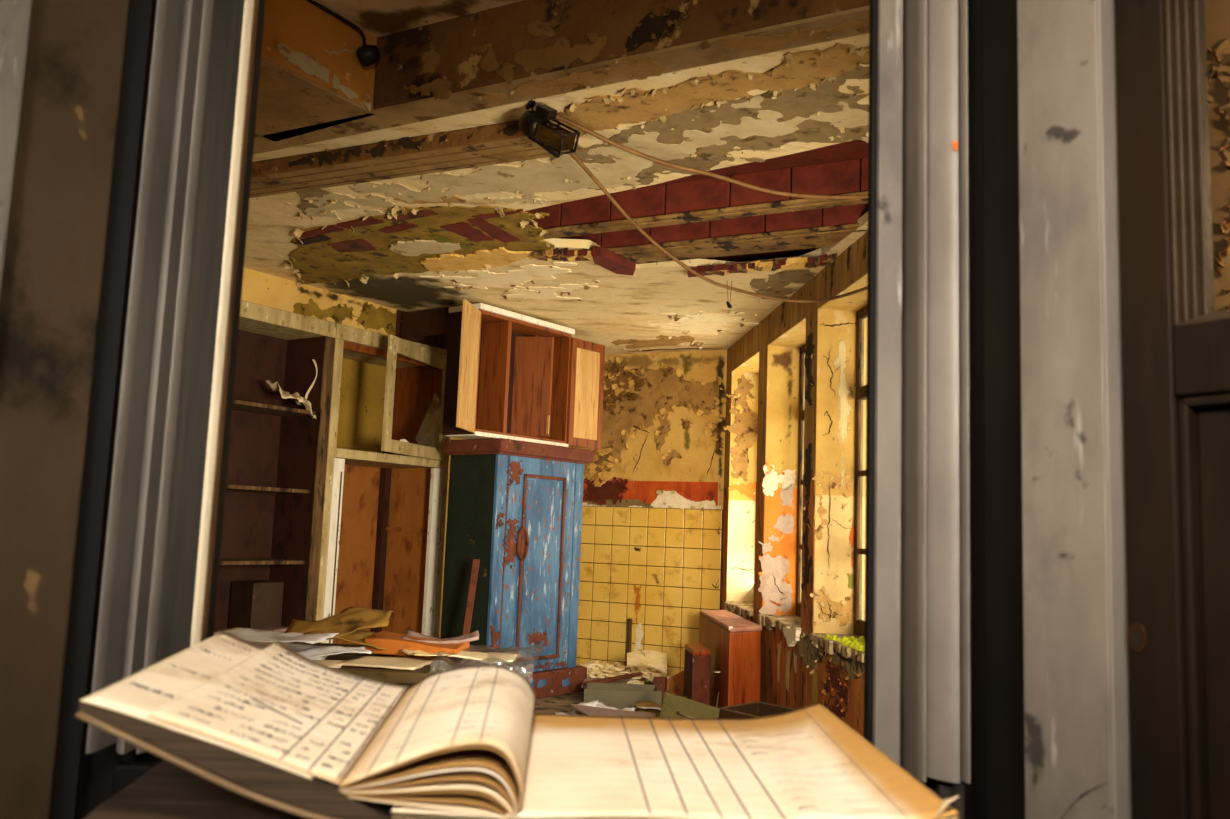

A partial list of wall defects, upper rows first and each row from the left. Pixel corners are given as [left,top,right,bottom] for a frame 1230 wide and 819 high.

peeling [275,4,870,252]
peeling [1207,39,1230,167]
peeling [293,299,402,336]
peeling [420,258,599,302]
peeling [1213,205,1230,312]
peeling [583,265,865,723]